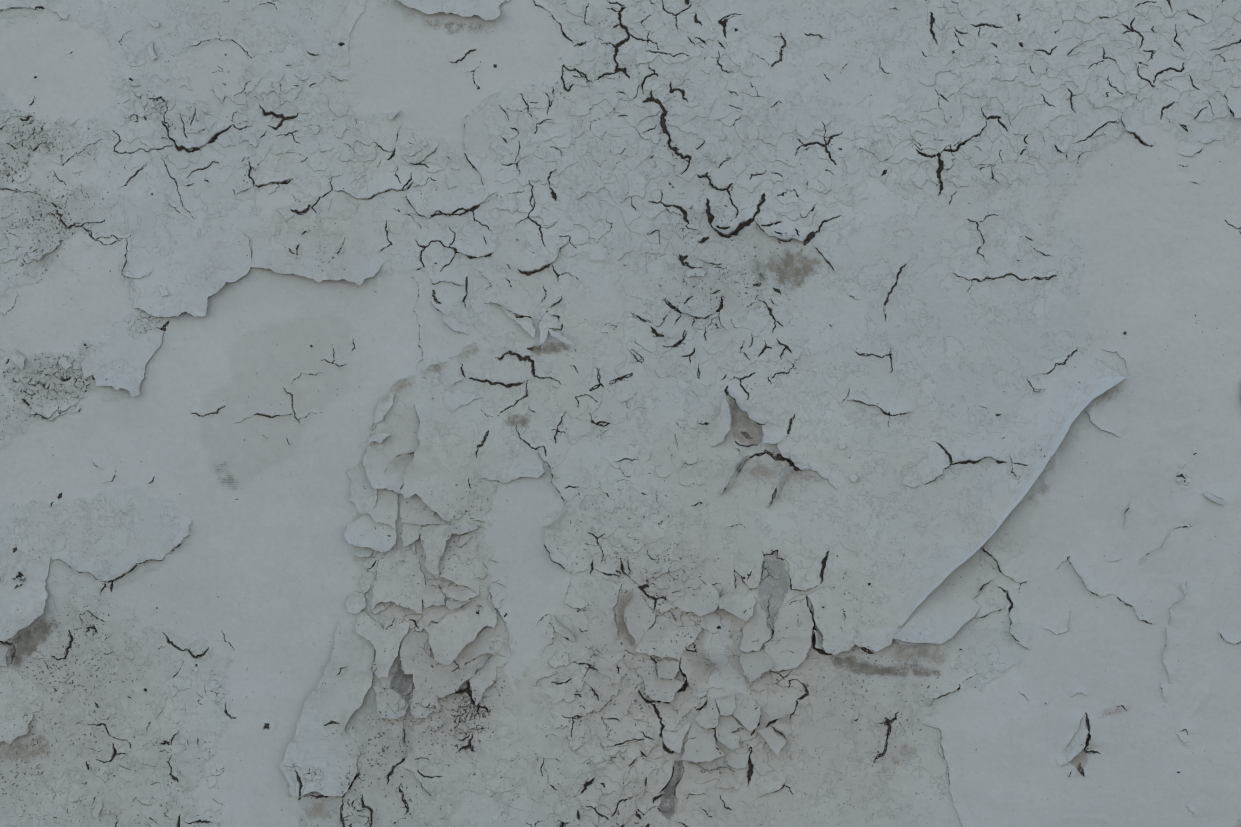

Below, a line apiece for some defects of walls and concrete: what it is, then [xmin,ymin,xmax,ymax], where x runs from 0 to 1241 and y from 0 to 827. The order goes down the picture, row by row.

peeling [397,0,510,20]
peeling [533,0,587,46]
crack [0,0,461,375]
peeling [0,97,583,422]
crack [359,0,1241,827]
peeling [0,714,33,744]
peeling [0,514,192,669]
peeling [279,328,1160,827]